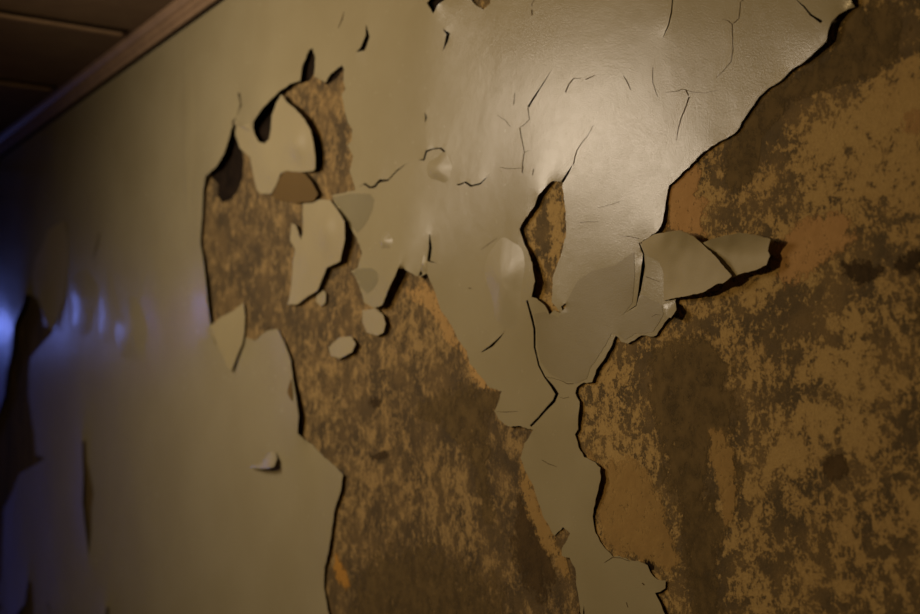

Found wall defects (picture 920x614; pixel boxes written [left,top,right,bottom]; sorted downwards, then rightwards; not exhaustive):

peeling [472,0,490,9]
crack [797,0,822,23]
crack [652,0,743,140]
crack [359,148,446,188]
crack [456,75,595,187]
peeling [200,69,580,614]
peeling [575,0,920,614]
damp [840,249,920,286]
damp [647,330,744,614]
damp [822,454,849,482]